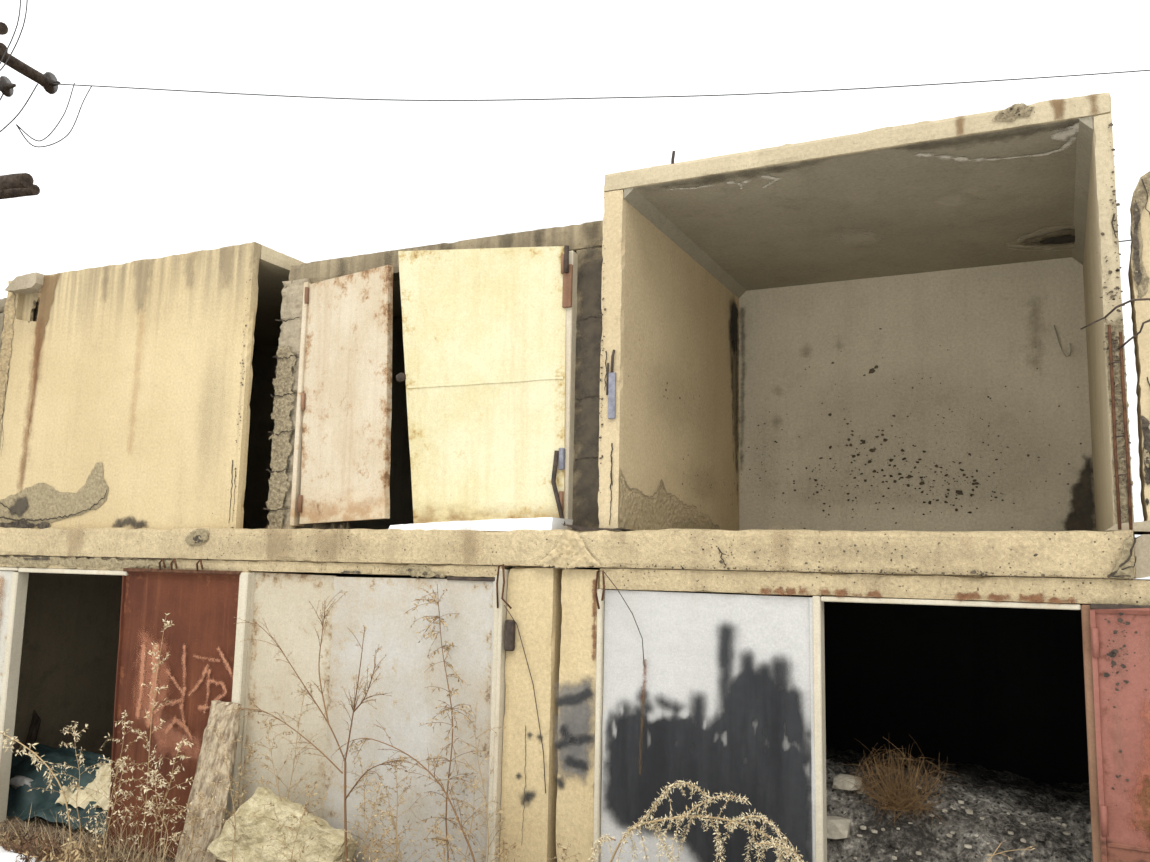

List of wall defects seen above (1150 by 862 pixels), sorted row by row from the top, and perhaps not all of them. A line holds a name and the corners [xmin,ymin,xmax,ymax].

rust [761,587,806,596]
rust [820,588,881,598]
rust [954,592,1075,604]
rust [1136,775,1150,838]